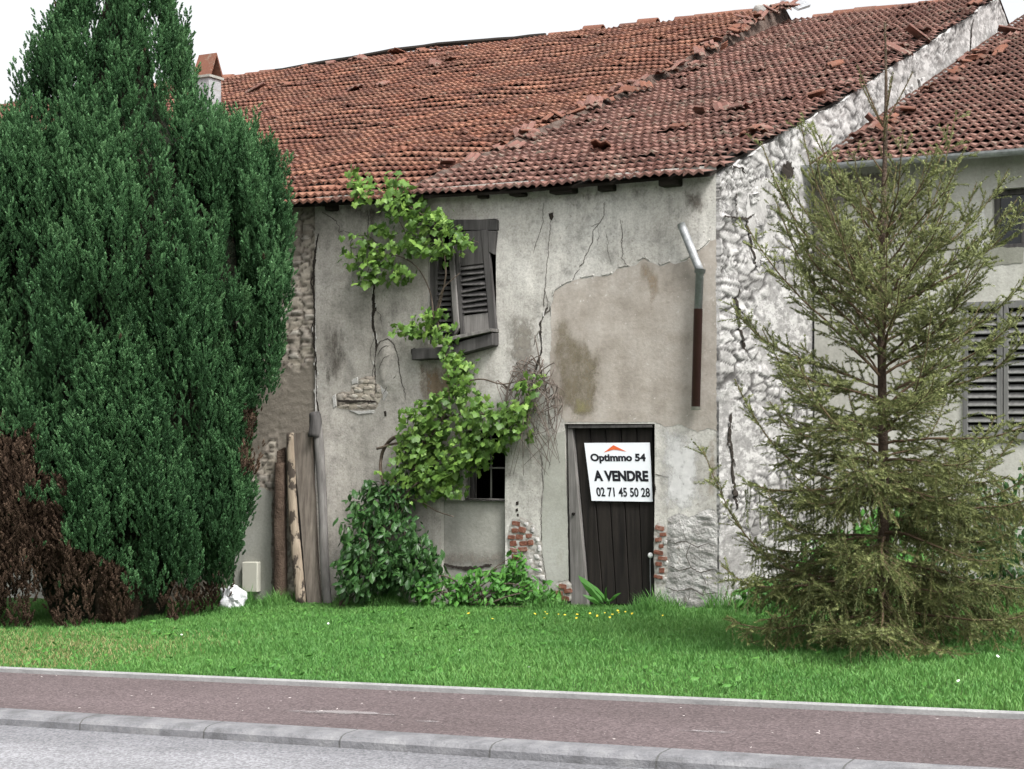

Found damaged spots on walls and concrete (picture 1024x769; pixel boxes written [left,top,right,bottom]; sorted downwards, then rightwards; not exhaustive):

crack [573,202,628,279]
crack [310,210,378,411]
crack [370,284,382,388]
crack [532,203,551,382]
flaking render [550,238,717,432]
spalling [332,376,388,416]
crack [727,413,740,509]
spalling [508,501,572,604]
spalling [654,509,720,608]